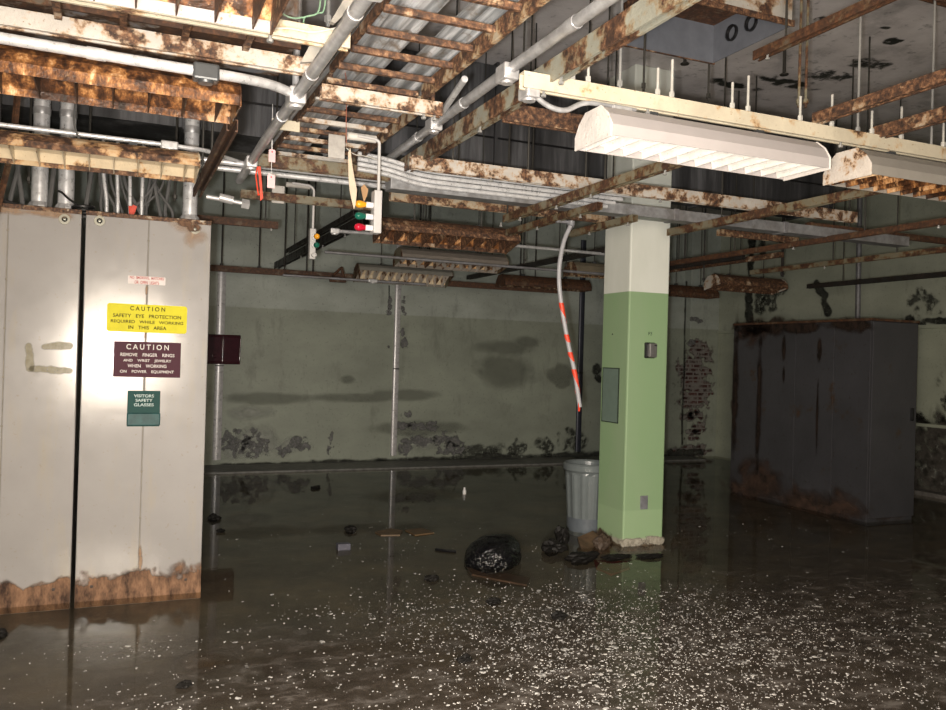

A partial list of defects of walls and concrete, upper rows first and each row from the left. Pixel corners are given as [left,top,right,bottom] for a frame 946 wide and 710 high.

spalling [667,338,715,457]
mould [221,427,599,465]
corrosion [0,548,201,614]